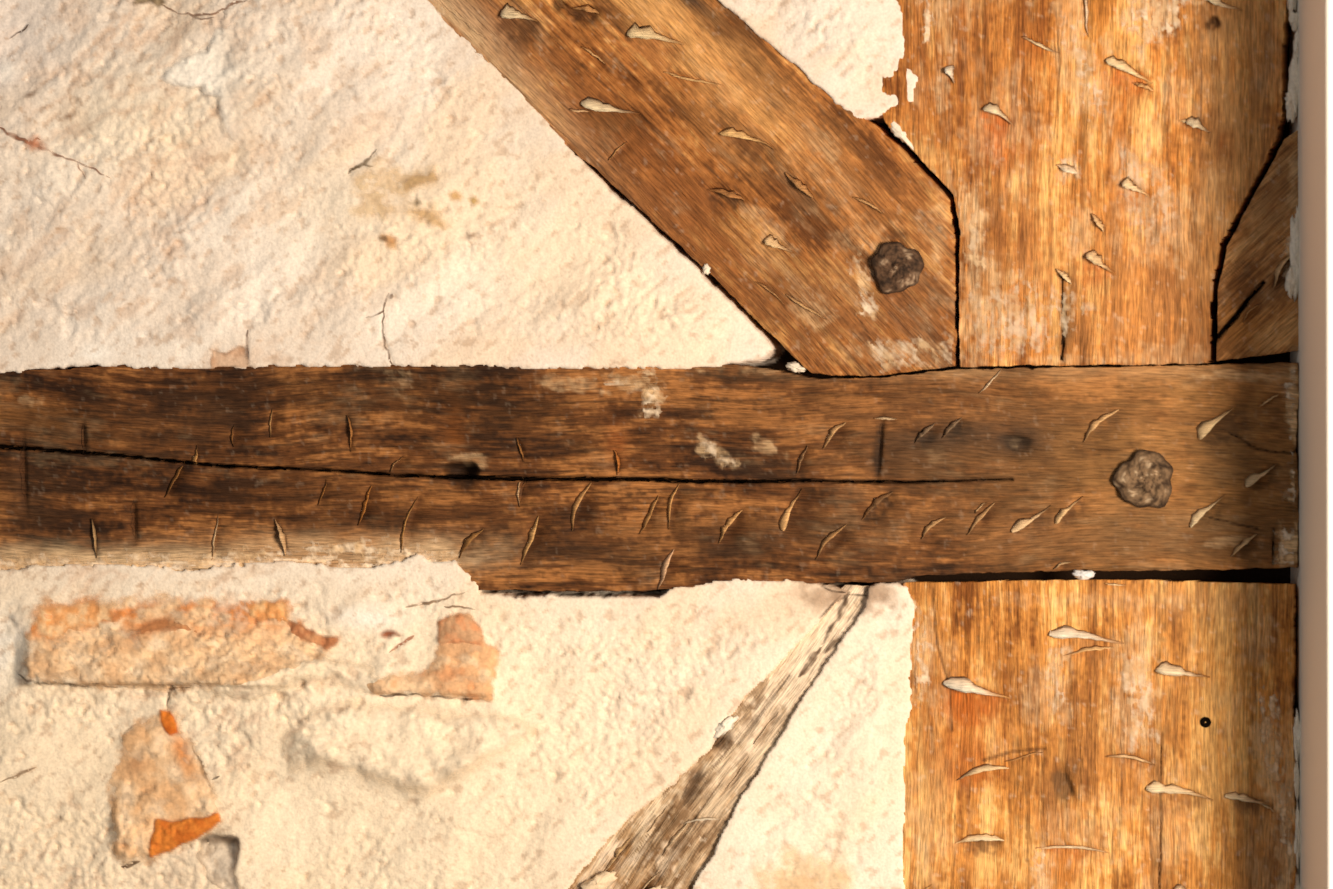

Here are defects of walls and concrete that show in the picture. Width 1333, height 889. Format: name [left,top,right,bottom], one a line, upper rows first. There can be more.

crack [0,127,101,179]
crack [0,430,1002,499]
spalling [25,594,338,690]
spalling [367,613,499,701]
spalling [110,710,239,889]